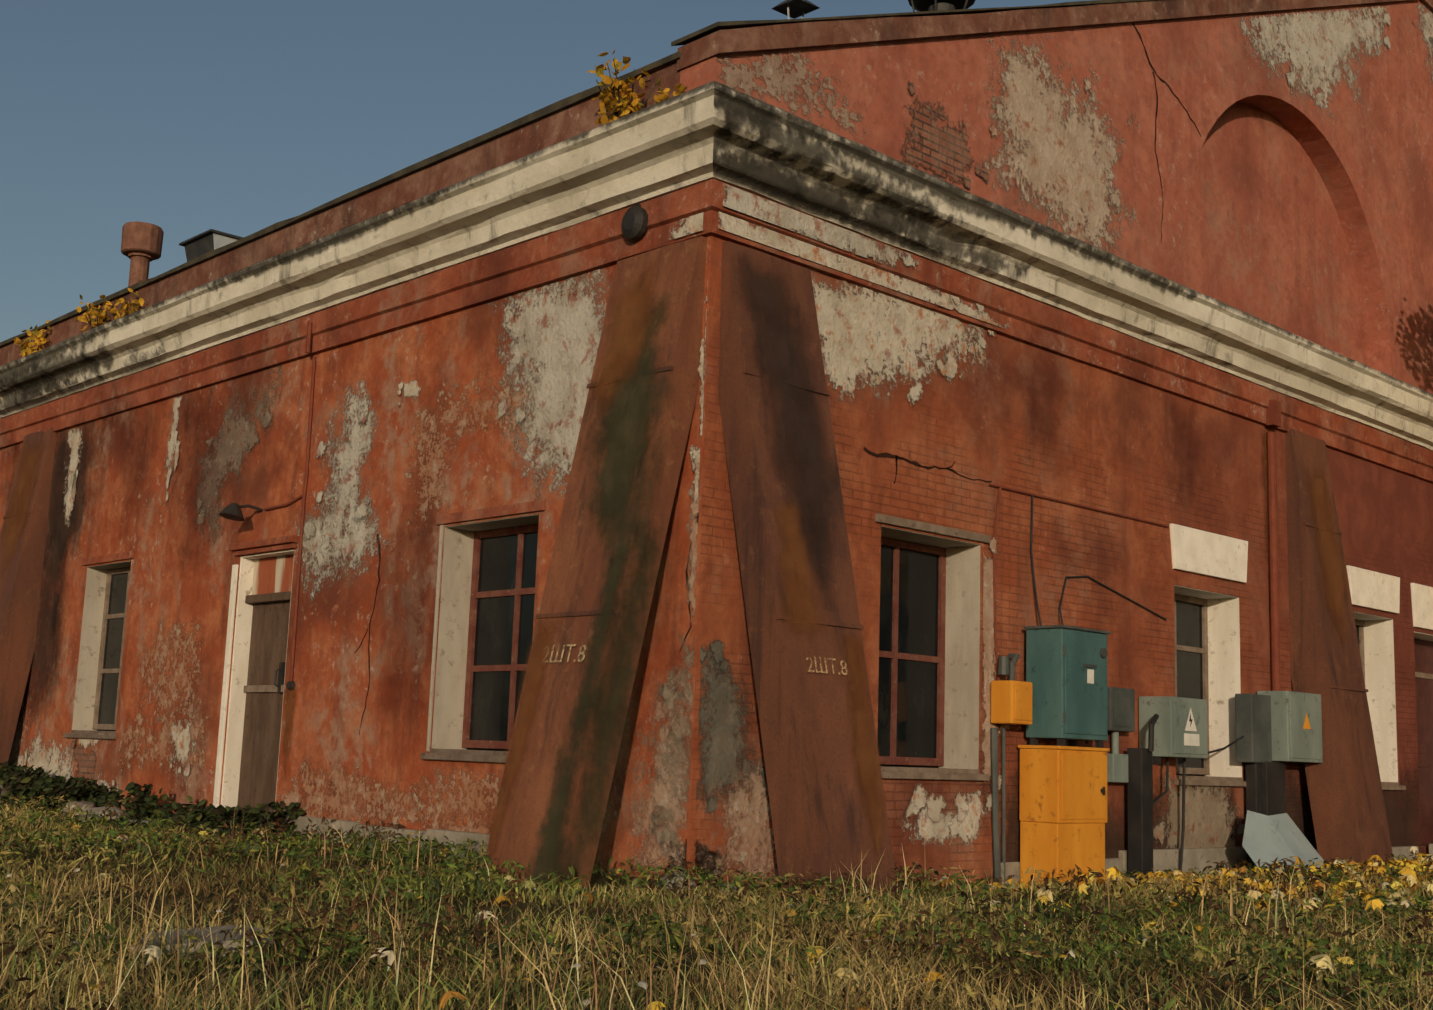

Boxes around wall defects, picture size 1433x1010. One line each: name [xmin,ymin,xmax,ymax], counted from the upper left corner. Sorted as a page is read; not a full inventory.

flaking render [900,35,1140,254]
crack [1132,22,1201,242]
flaking render [1241,6,1391,120]
flaking render [193,366,282,544]
flaking render [295,379,391,600]
flaking render [489,269,609,499]
flaking render [669,183,1009,405]
crack [863,447,992,484]
crack [355,530,381,734]
damp [630,695,689,874]
flaking render [902,537,1010,848]